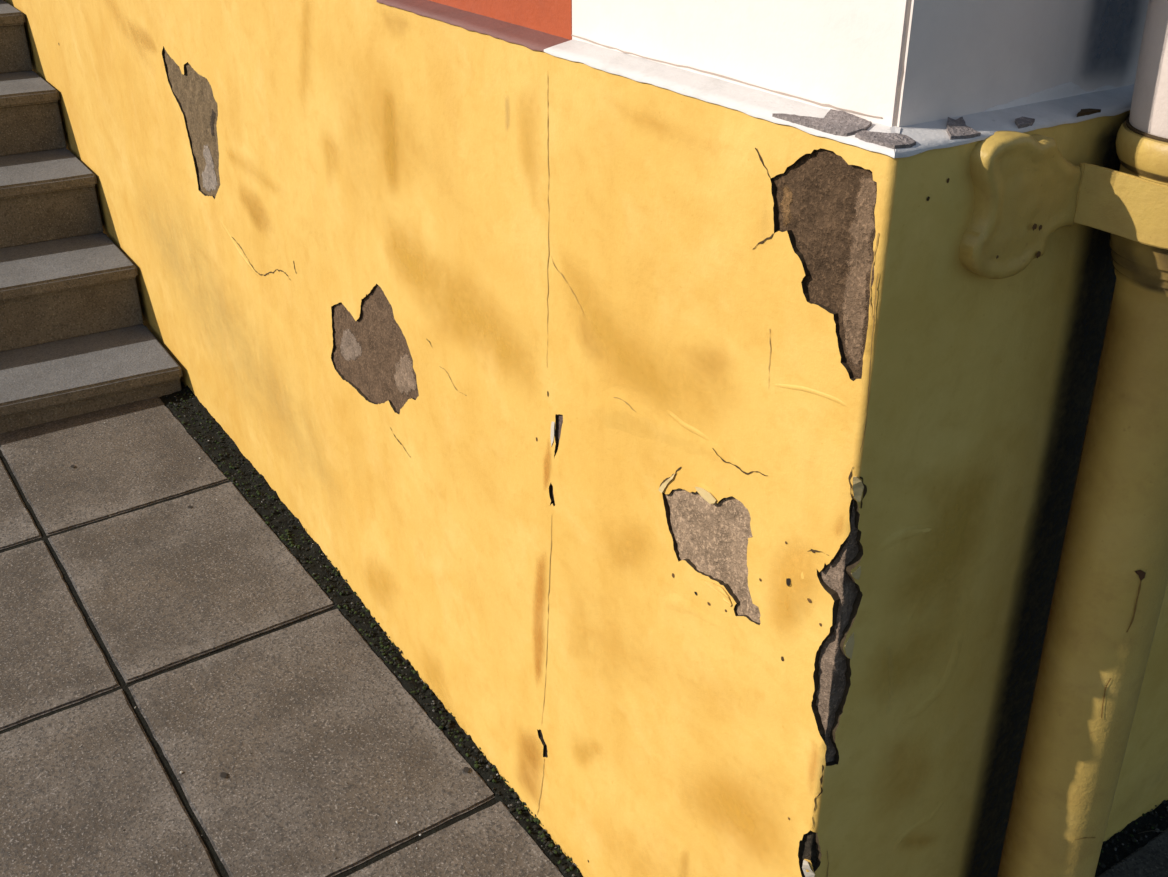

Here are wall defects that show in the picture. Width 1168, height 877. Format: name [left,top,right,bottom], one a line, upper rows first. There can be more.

spalling [164,48,220,197]
spalling [772,109,916,149]
spalling [946,117,981,140]
crack [232,237,296,276]
spalling [773,149,877,379]
spalling [333,285,419,412]
spalling [536,414,563,451]
crack [713,449,768,476]
spalling [659,473,761,623]
spalling [816,477,864,763]
spalling [801,831,818,877]